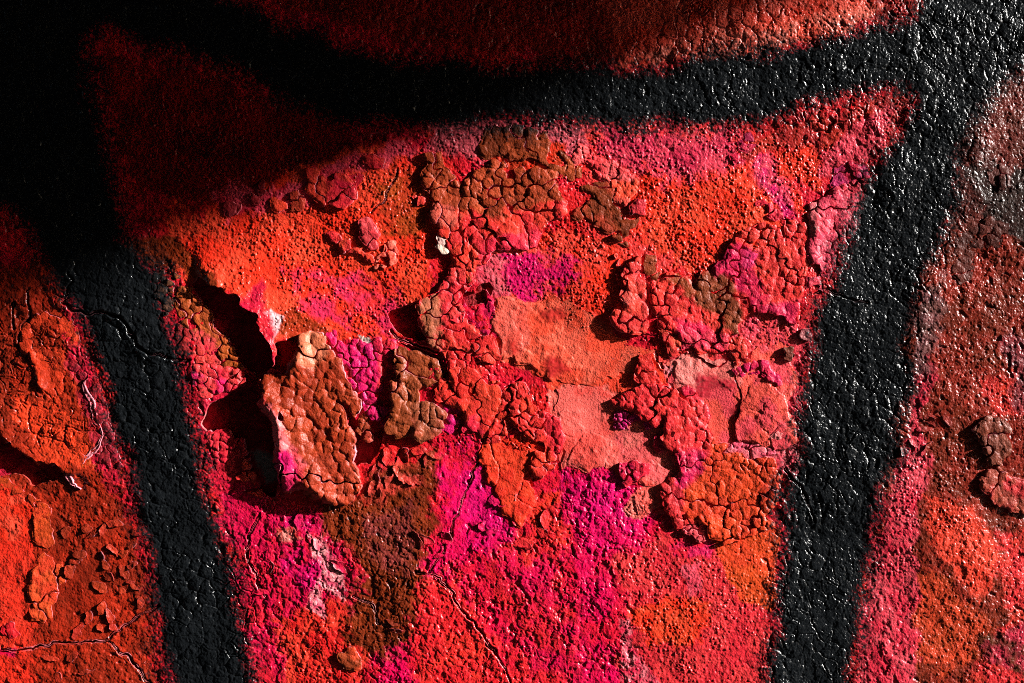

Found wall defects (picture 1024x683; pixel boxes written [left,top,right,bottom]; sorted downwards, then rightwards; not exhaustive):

peeling [0,308,146,683]
crack [1,605,159,683]
crack [418,426,511,683]
peeling [152,123,873,550]
peeling [971,415,1024,515]